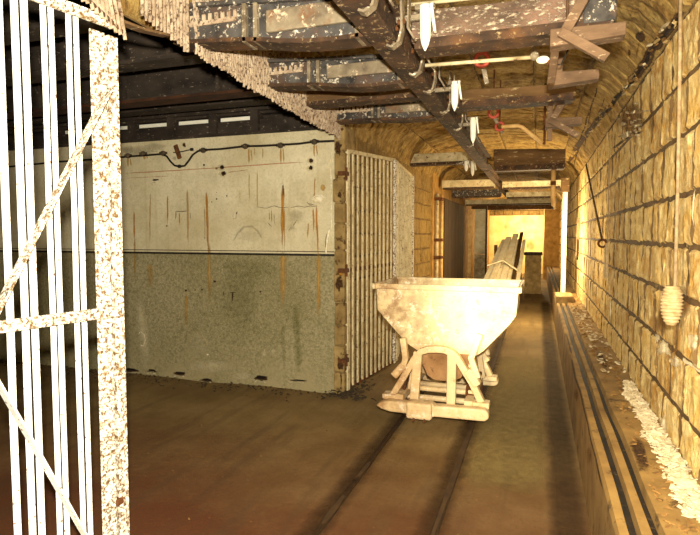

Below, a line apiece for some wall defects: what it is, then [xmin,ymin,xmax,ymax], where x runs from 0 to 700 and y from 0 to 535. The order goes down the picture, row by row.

corrosion [185,194,216,318]
water stain [631,440,648,469]